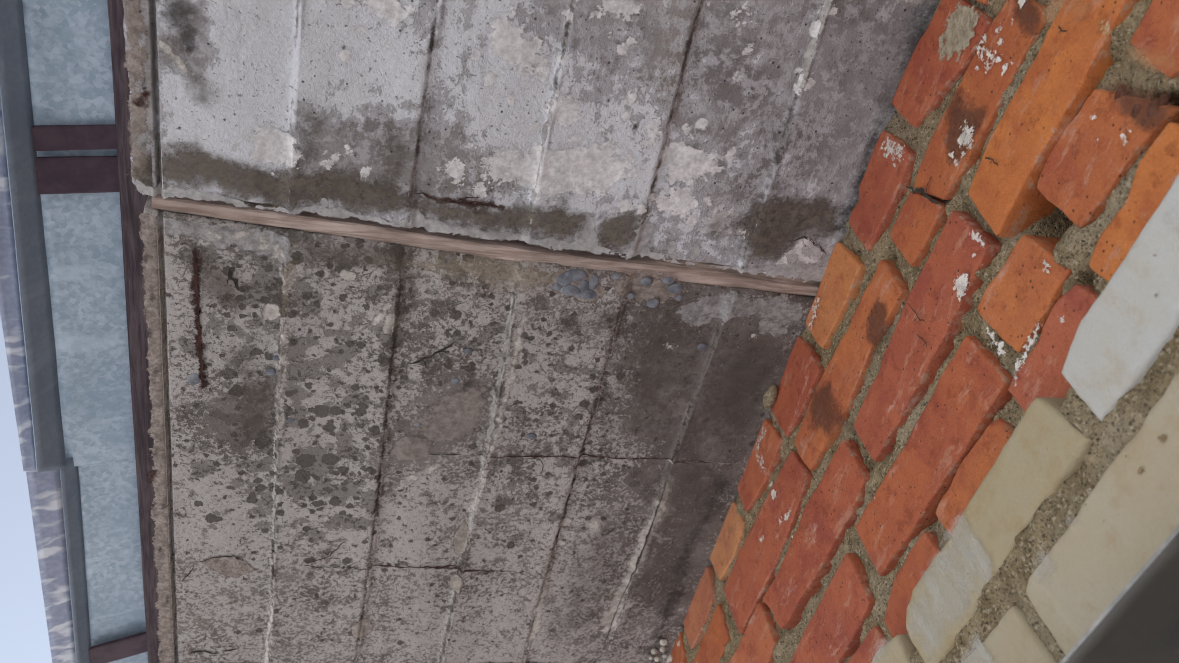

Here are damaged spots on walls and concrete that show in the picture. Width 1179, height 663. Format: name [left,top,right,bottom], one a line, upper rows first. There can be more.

water stain [159,40,201,85]
water stain [947,92,984,166]
water stain [134,143,585,239]
crack [410,192,503,208]
water stain [598,211,644,250]
water stain [740,132,907,260]
rust [188,243,207,388]
crack [431,453,742,471]
water stain [756,427,777,499]
crack [305,542,517,573]
water stain [600,474,674,653]